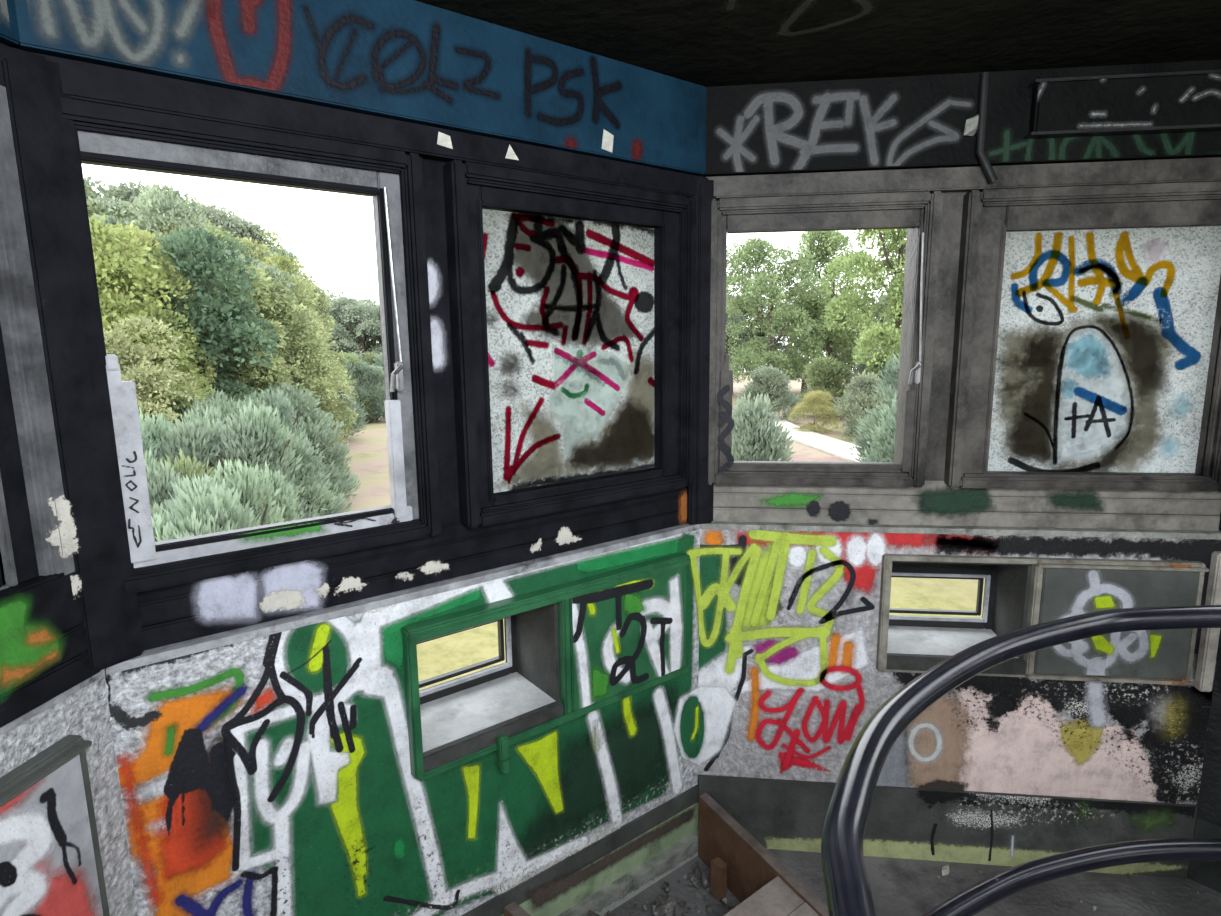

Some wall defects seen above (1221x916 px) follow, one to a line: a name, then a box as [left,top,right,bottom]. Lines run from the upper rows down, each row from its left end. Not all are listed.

peeling [46,495,79,558]
peeling [395,560,450,582]
peeling [70,575,82,595]